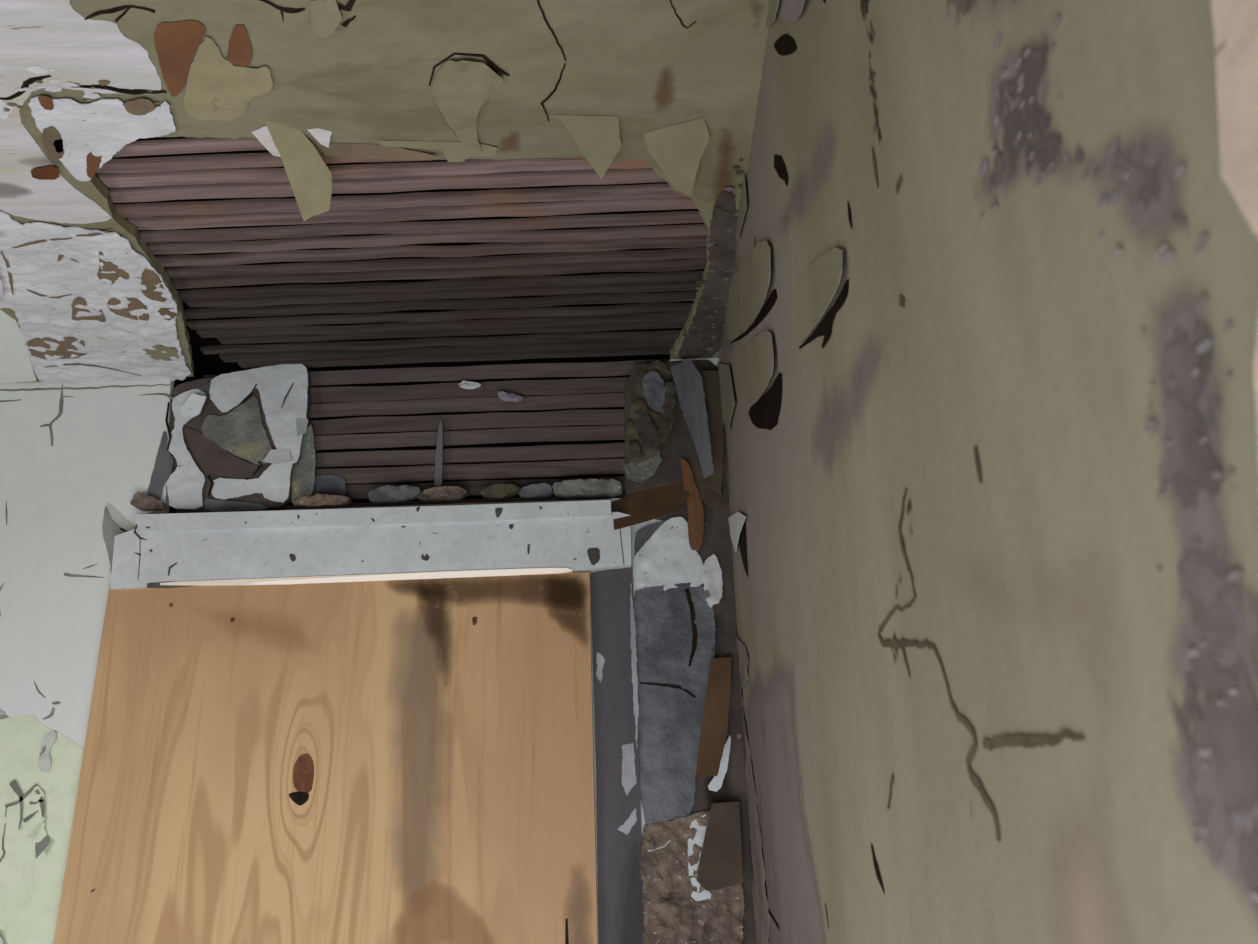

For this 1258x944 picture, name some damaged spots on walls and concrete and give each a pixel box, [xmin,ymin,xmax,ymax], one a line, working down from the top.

crack [537,0,567,121]
crack [669,0,697,29]
peeling [765,0,805,56]
peeling [979,13,1186,267]
peeling [1211,0,1258,236]
flaking render [0,0,782,607]
peeling [796,247,849,349]
peeling [5,702,60,858]
peeling [736,634,824,944]
crack [878,487,1084,842]
peeling [1144,294,1258,913]